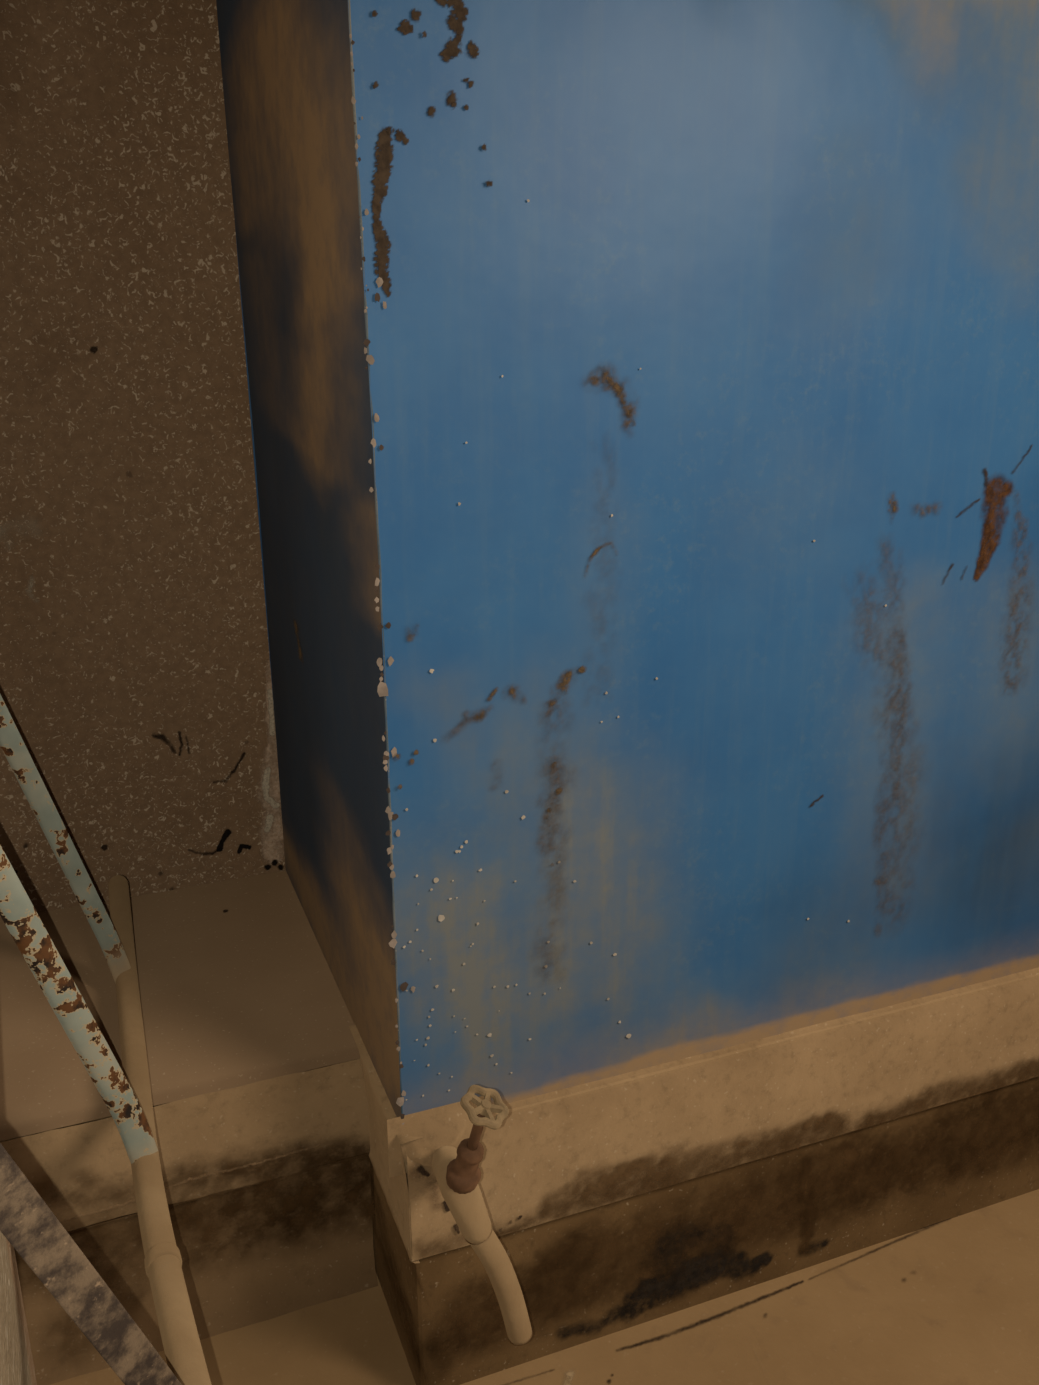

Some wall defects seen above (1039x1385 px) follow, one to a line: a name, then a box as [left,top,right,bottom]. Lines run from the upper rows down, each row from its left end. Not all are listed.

rust [591,372,635,428]
rust [974,478,1012,581]
rust [549,666,585,712]
damp [66,1193,142,1289]
damp [165,1144,375,1258]
damp [517,1060,1039,1337]
damp [380,1242,505,1377]